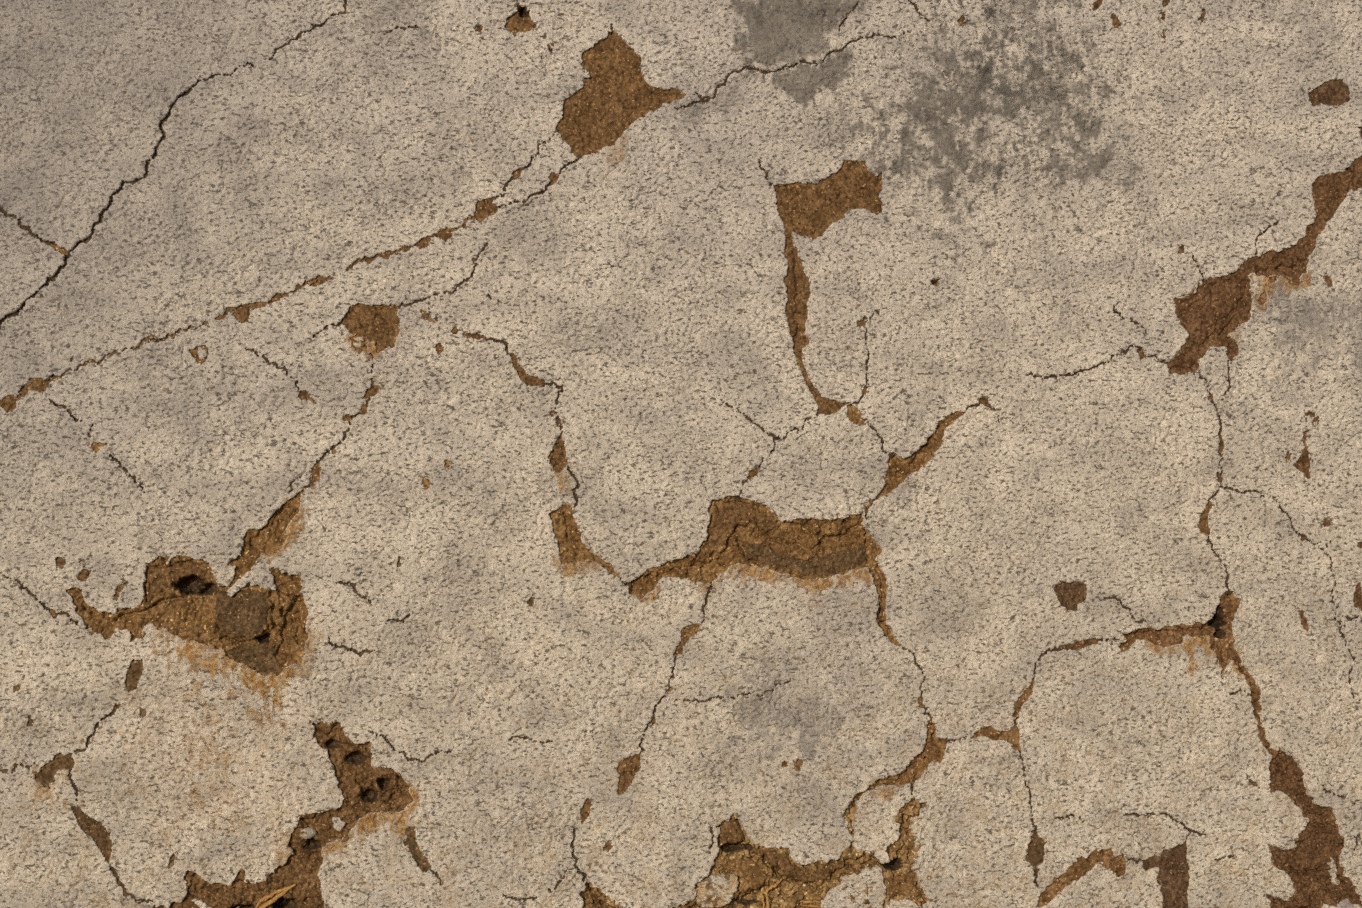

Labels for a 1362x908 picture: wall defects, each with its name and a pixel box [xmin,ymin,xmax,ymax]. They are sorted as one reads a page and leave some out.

crack [0,0,347,330]
spalling [555,24,686,157]
spalling [1308,79,1352,106]
crack [0,129,582,497]
crack [721,310,880,501]
crack [1027,360,1111,380]
spalling [2,493,308,676]
crack [328,580,414,657]
spalling [313,127,1362,908]
crack [1198,373,1362,701]
spalling [0,659,414,908]
crack [1124,812,1237,861]